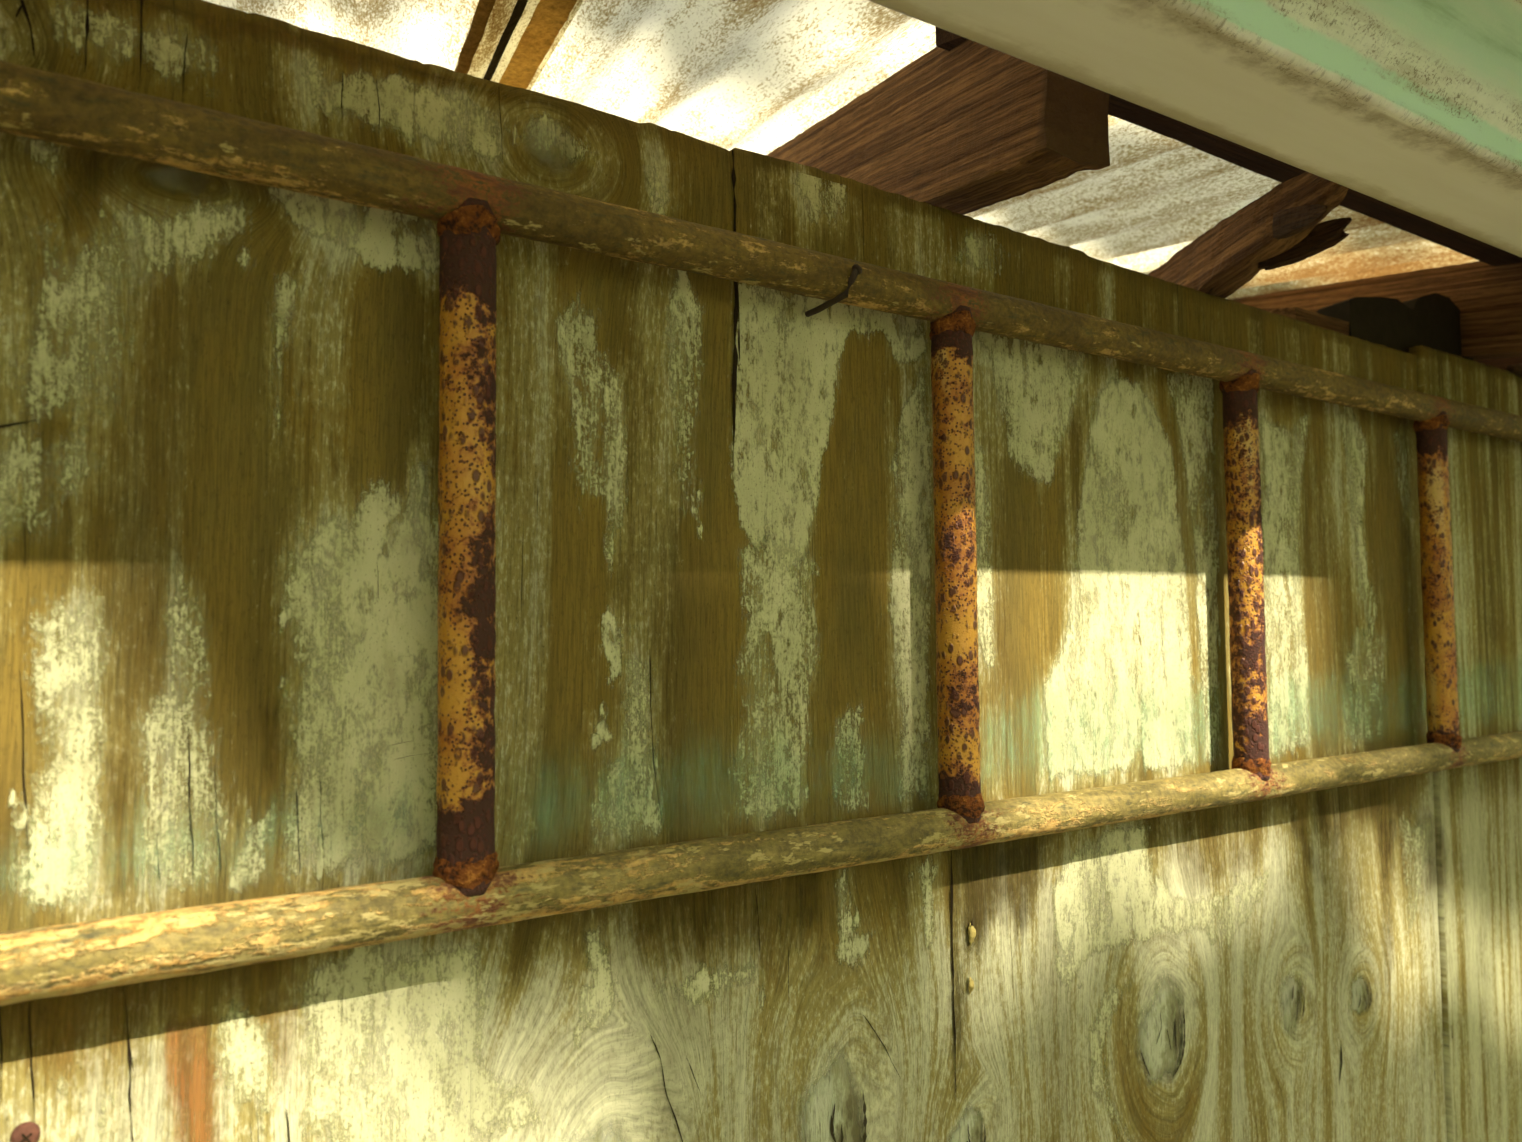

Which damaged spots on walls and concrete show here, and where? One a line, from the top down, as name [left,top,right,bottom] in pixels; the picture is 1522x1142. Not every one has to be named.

crack [730,150,738,232]
crack [732,281,740,453]
rust [167,1026,213,1142]